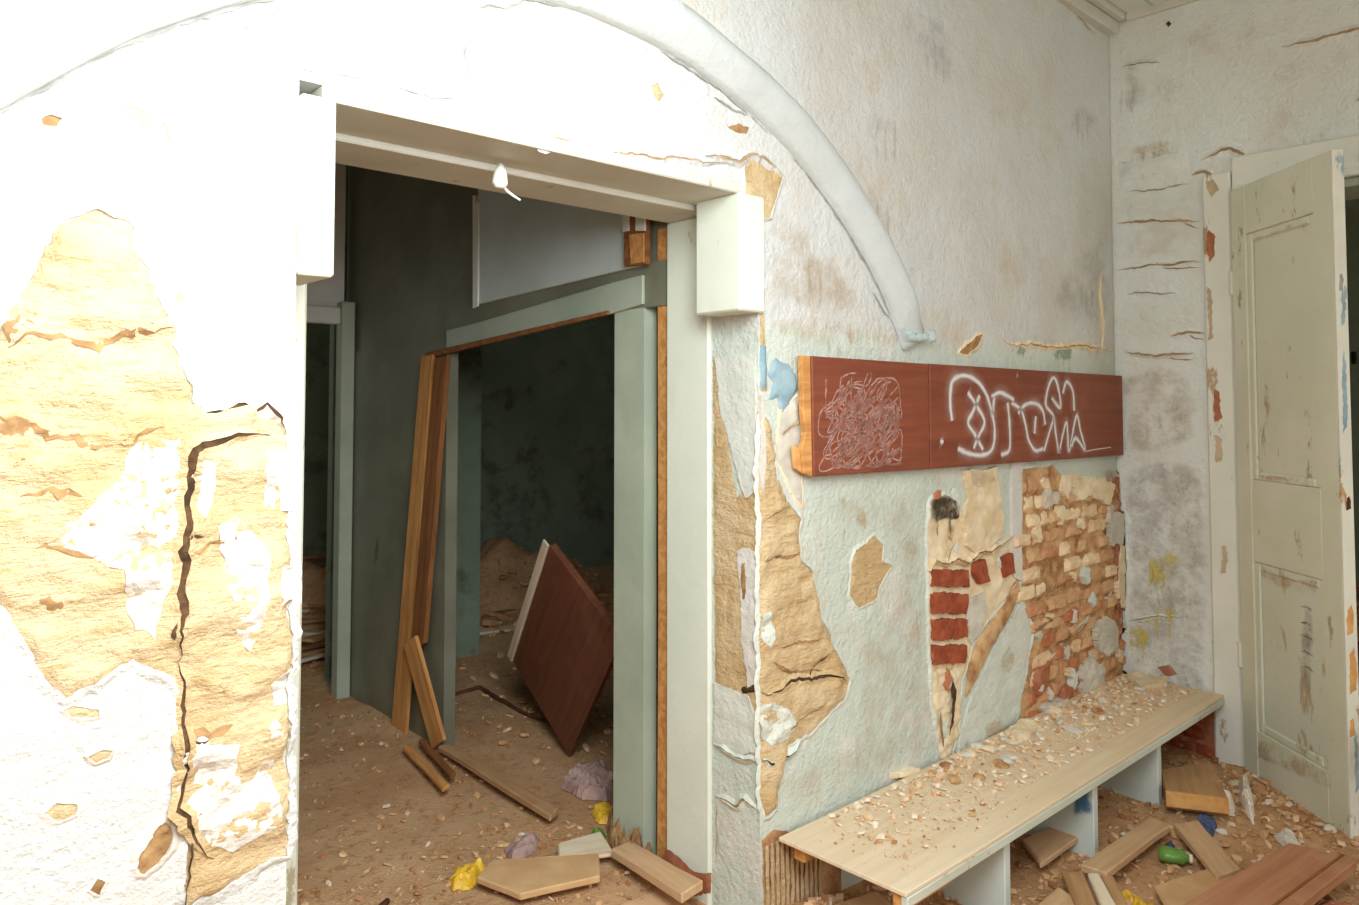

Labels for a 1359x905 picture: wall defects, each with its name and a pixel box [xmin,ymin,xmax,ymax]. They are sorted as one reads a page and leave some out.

crack [478,0,559,9]
crack [1122,59,1161,70]
crack [1281,24,1359,48]
spalling [34,111,65,131]
spalling [741,159,784,222]
crack [1002,144,1250,361]
spalling [0,203,303,905]
spalling [712,287,852,821]
spalling [847,532,894,611]
flaking render [924,460,1128,760]
crack [166,395,287,905]